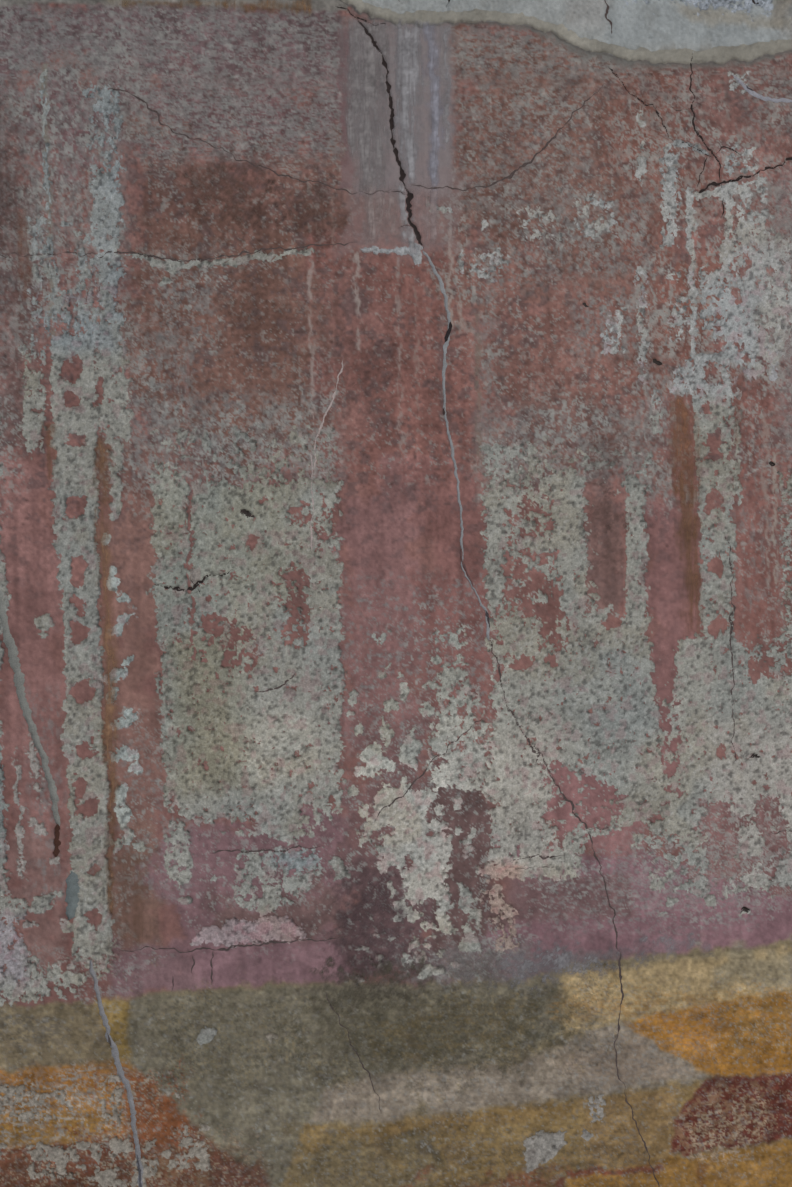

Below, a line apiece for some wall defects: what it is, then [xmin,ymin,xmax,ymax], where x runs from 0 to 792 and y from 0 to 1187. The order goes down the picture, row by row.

crack [1,242,351,262]
crack [604,0,612,34]
crack [609,56,792,217]
crack [0,590,80,920]
peeling [0,69,315,1007]
crack [111,7,659,1185]
flaking render [149,140,792,980]
crack [89,960,144,1187]